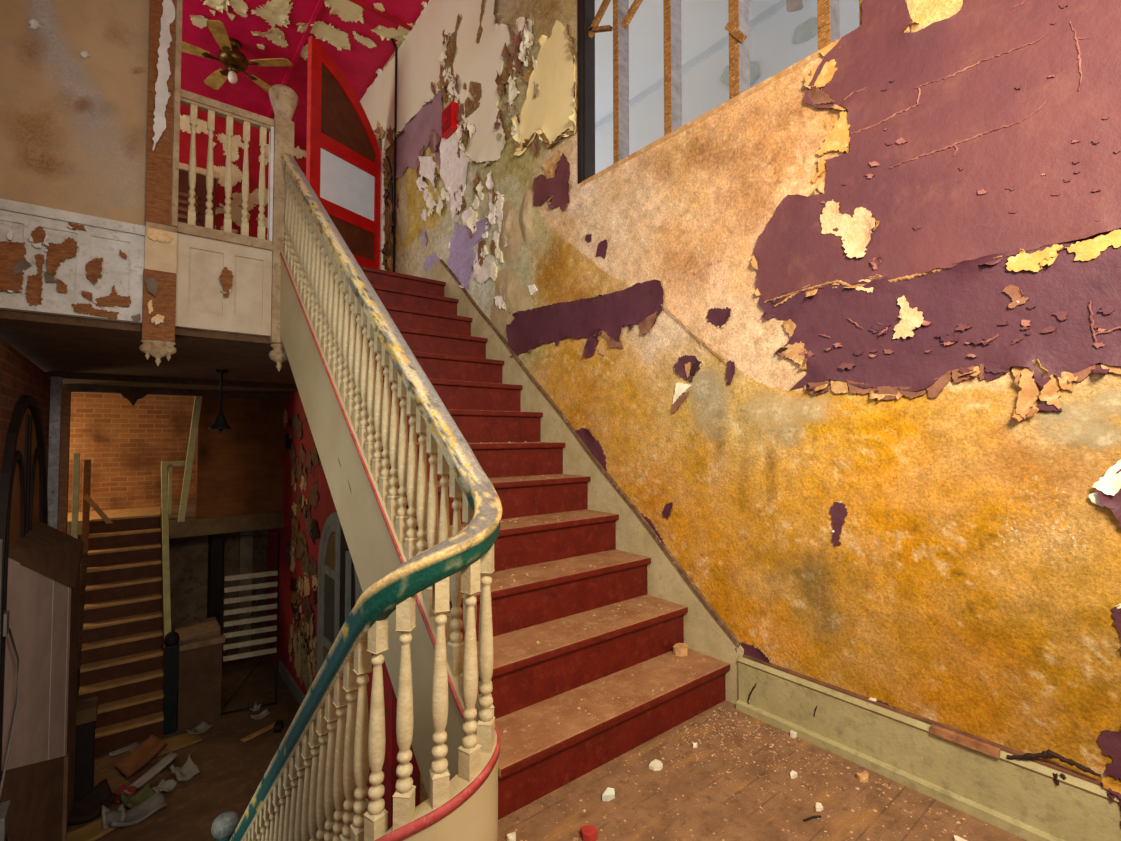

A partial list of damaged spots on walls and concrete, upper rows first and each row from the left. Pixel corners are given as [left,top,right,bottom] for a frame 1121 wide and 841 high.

peeling [152,0,175,150]
peeling [180,0,576,290]
peeling [746,0,1121,447]
peeling [0,222,164,325]
peeling [219,267,233,298]
peeling [494,279,664,358]
flaking render [671,355,736,428]
peeling [283,409,320,692]
peeling [829,501,848,546]
peeling [1088,460,1121,527]
crack [1007,749,1101,786]
peeling [1097,730,1121,794]